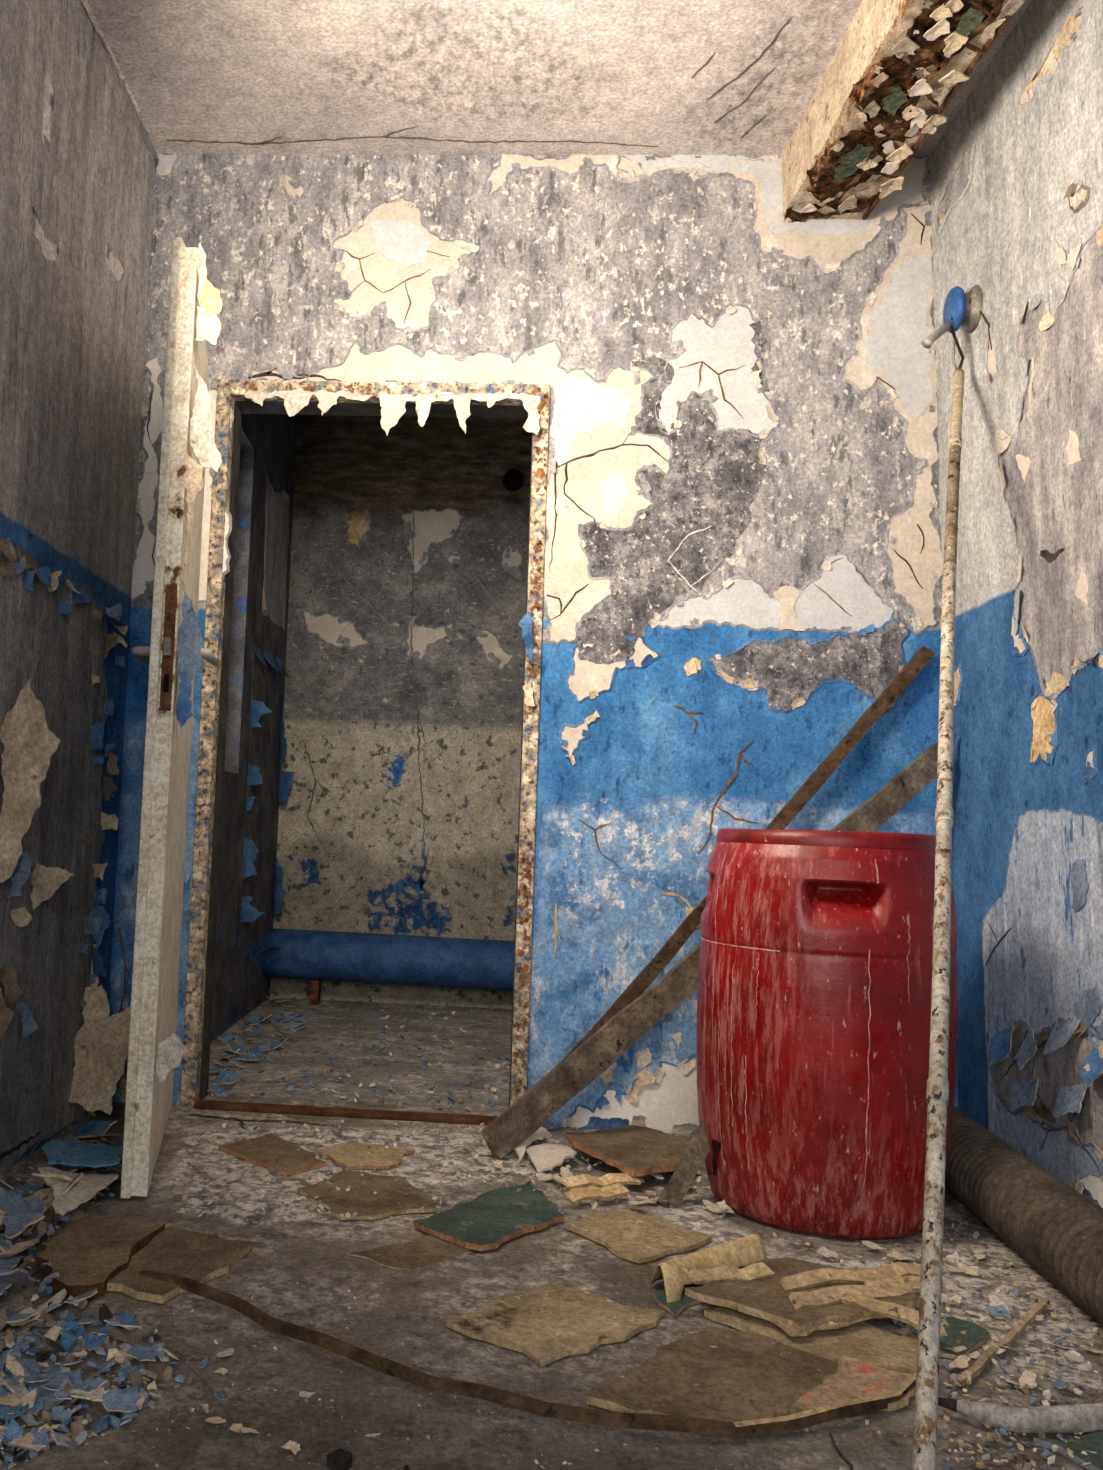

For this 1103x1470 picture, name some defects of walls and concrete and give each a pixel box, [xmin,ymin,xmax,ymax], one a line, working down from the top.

peeling [1018,6,1084,105]
peeling [175,359,234,728]
peeling [194,242,222,345]
corrosion [517,388,550,487]
corrosion [524,538,544,719]
peeling [244,0,1024,765]
peeling [993,222,1103,766]
peeling [1064,179,1090,213]
peeling [0,356,165,1295]
peeling [239,646,295,969]
corrosion [512,842,533,1091]
peeling [987,1017,1103,1208]